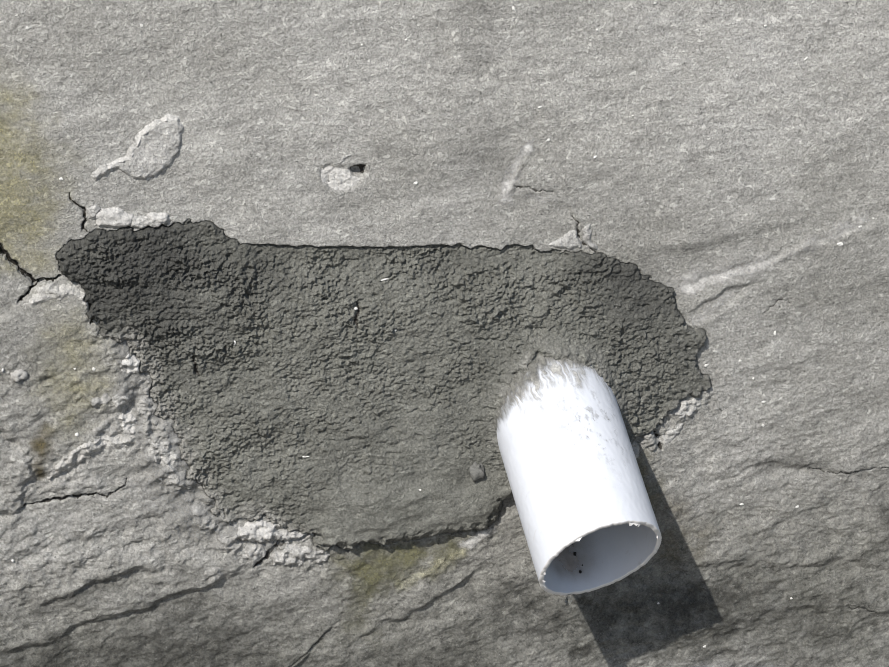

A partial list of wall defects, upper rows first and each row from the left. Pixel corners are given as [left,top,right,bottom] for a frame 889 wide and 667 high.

hole [320,154,366,195]
crack [69,192,90,233]
peeling [86,205,170,229]
crack [0,243,61,301]
crack [21,478,127,508]
spalling [199,518,330,566]
damp [435,529,494,568]
spalling [204,567,223,587]
damp [342,542,427,597]